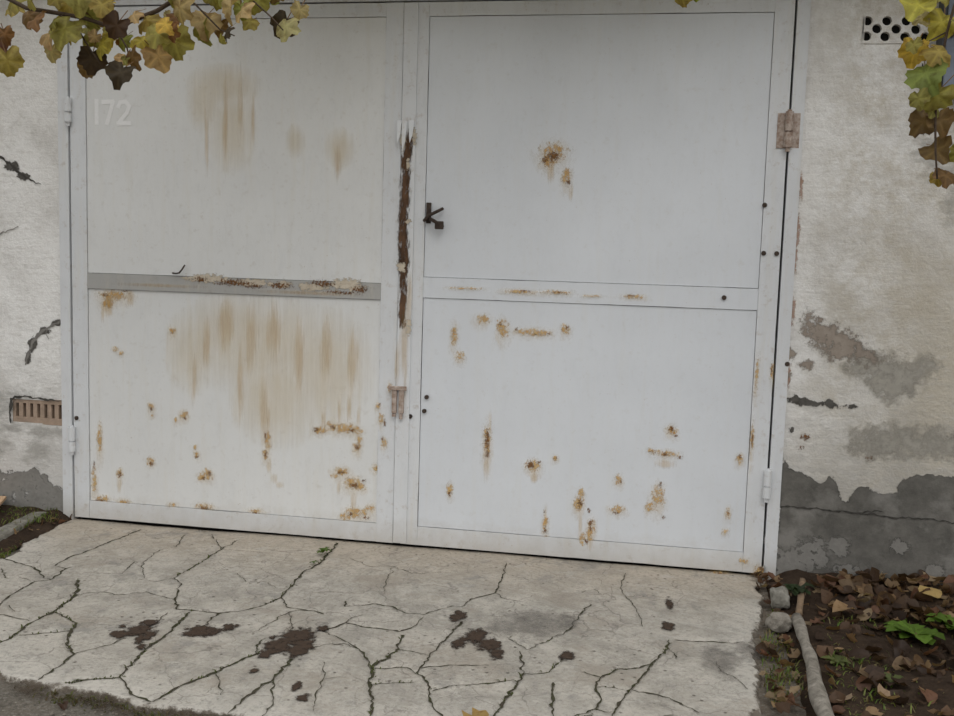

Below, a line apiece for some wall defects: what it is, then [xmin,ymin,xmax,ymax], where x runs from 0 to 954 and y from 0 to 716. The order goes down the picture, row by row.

crack [0,156,40,184]
corrosion [542,142,570,185]
corrosion [396,127,418,336]
crack [25,319,61,365]
peeling [788,312,936,405]
flaking render [787,395,857,409]
corrosion [314,422,363,450]
flaking render [0,467,75,512]
corrosion [335,468,366,490]
corrosion [573,488,595,544]
flaking render [776,461,954,585]
crack [0,529,746,716]